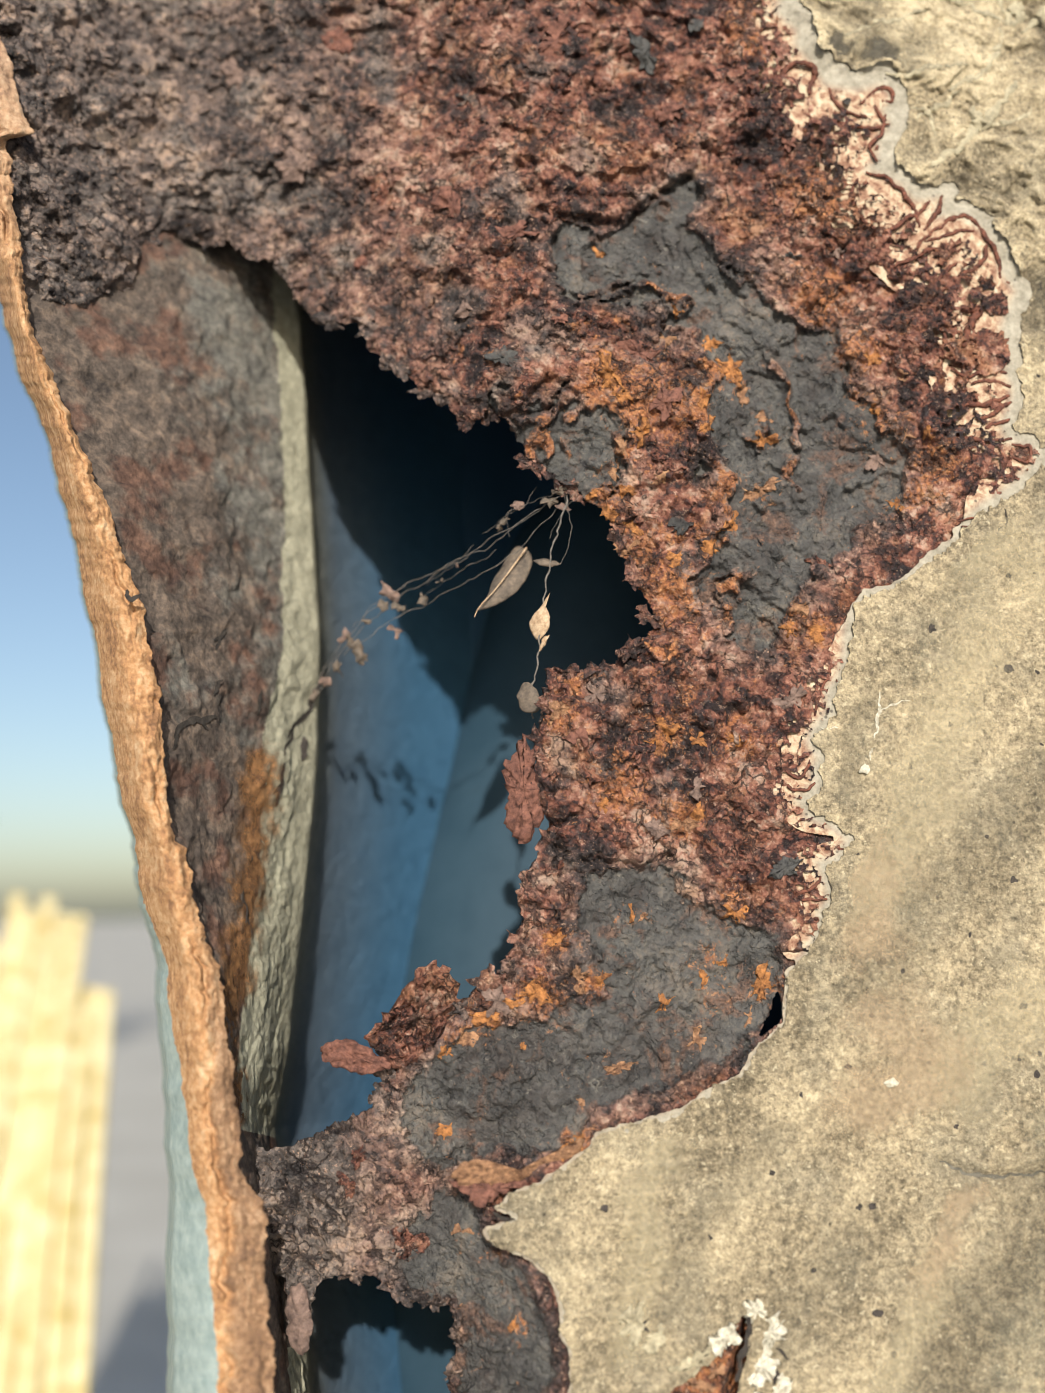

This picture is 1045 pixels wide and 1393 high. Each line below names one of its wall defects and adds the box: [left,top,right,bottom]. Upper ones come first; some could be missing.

spalling [300,737,309,761]
corrosion [502,733,544,844]
corrosion [221,749,279,1124]
corrosion [320,960,461,1075]
corrosion [447,1138,584,1208]
corrosion [284,1282,313,1356]
spalling [618,1301,667,1355]
spalling [668,1299,793,1393]